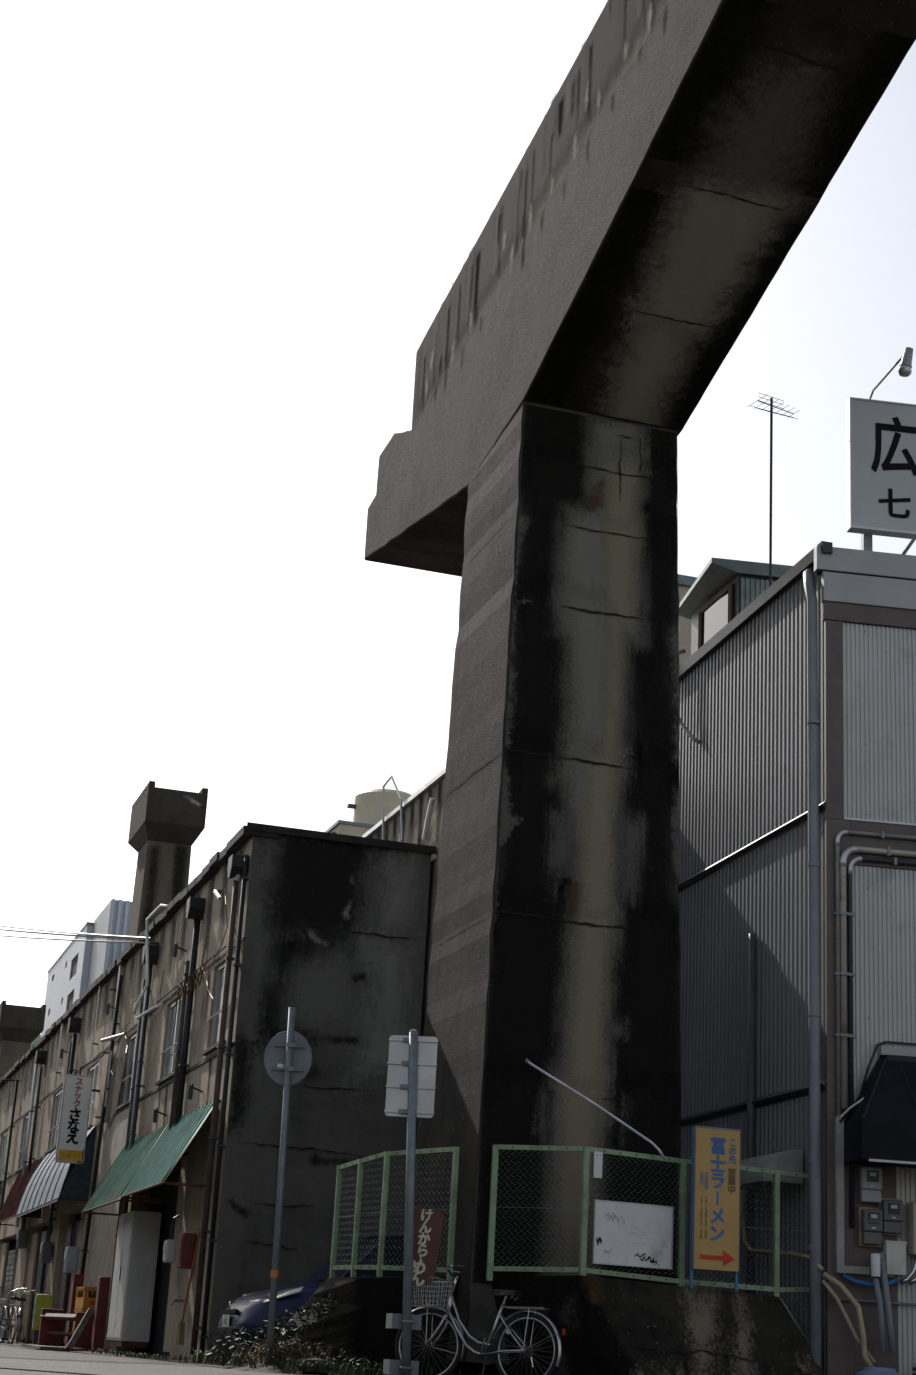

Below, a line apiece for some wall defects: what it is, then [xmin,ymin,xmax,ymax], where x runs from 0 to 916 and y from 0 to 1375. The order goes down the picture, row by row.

water stain [345,0,915,1375]
water stain [0,844,244,1108]
water stain [228,782,441,1130]